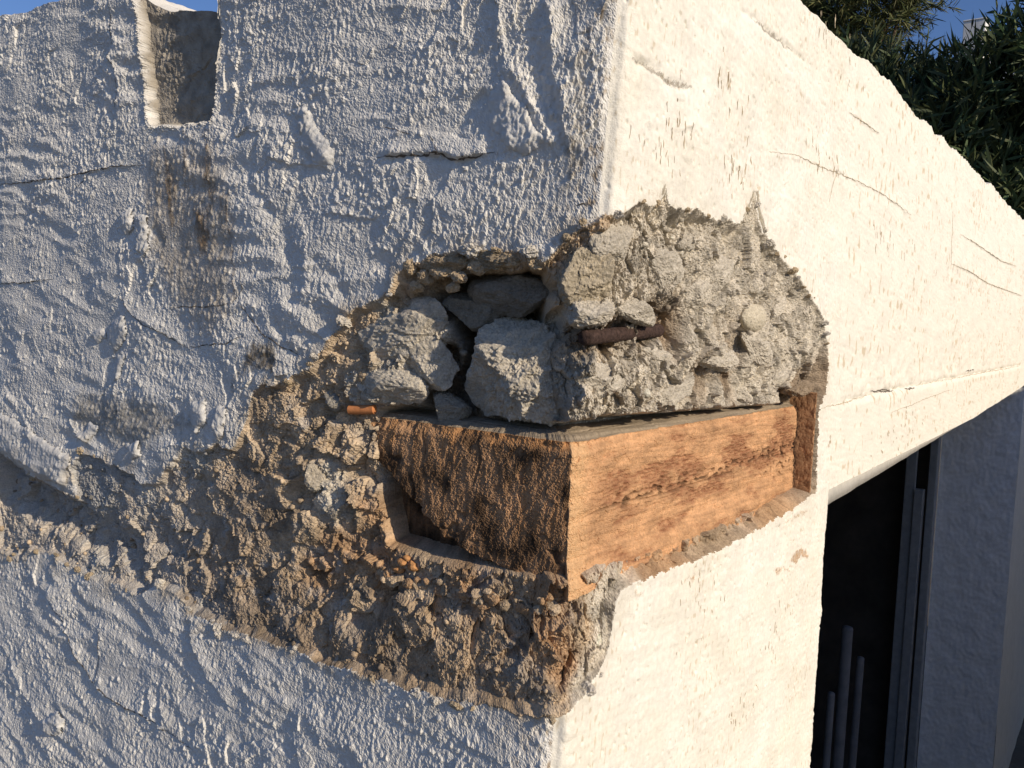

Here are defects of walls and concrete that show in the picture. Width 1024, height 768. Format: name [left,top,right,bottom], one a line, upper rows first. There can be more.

crack [0,165,139,186]
crack [377,127,494,161]
crack [775,152,911,215]
crack [951,220,1020,295]
spalling [0,61,831,725]